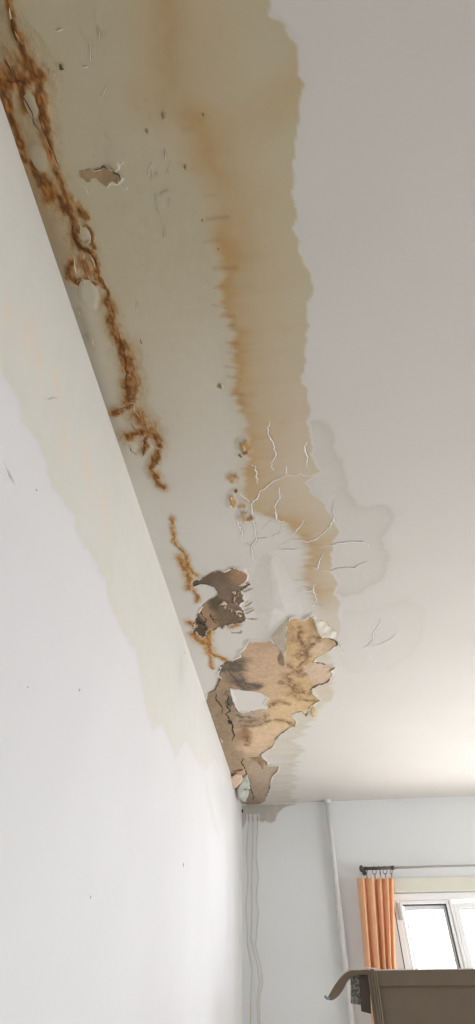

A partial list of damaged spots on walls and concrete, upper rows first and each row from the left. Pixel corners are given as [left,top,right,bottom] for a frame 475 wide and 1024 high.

peeling [79,161,128,190]
corrosion [0,0,248,673]
damp [70,0,434,674]
crack [237,422,371,606]
peeling [193,566,338,805]